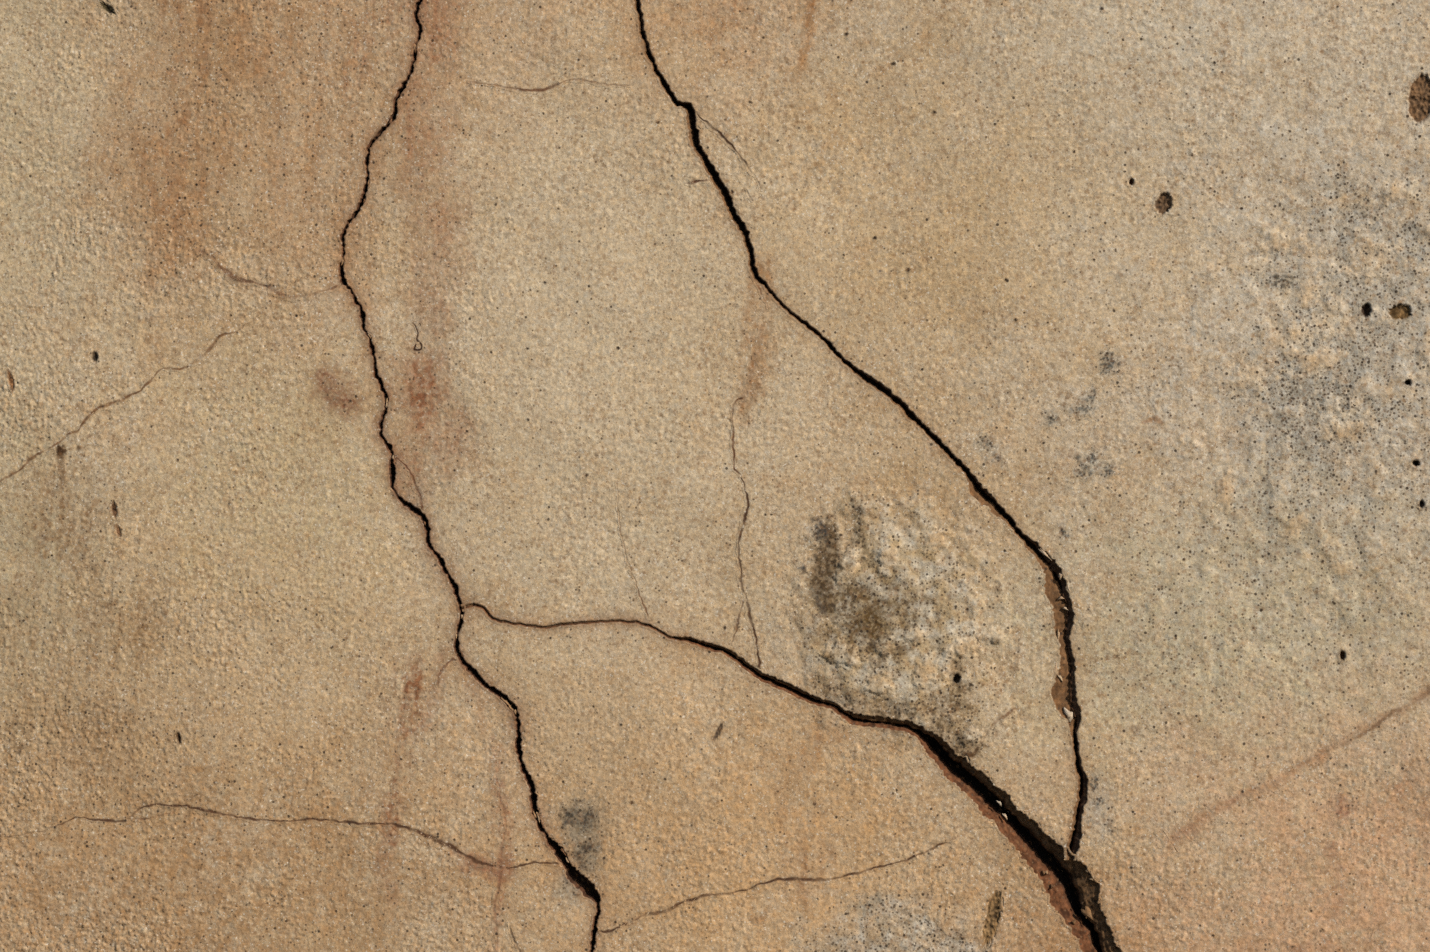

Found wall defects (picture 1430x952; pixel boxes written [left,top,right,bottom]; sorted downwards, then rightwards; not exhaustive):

damp [0,427,236,828]
crack [0,0,1131,952]